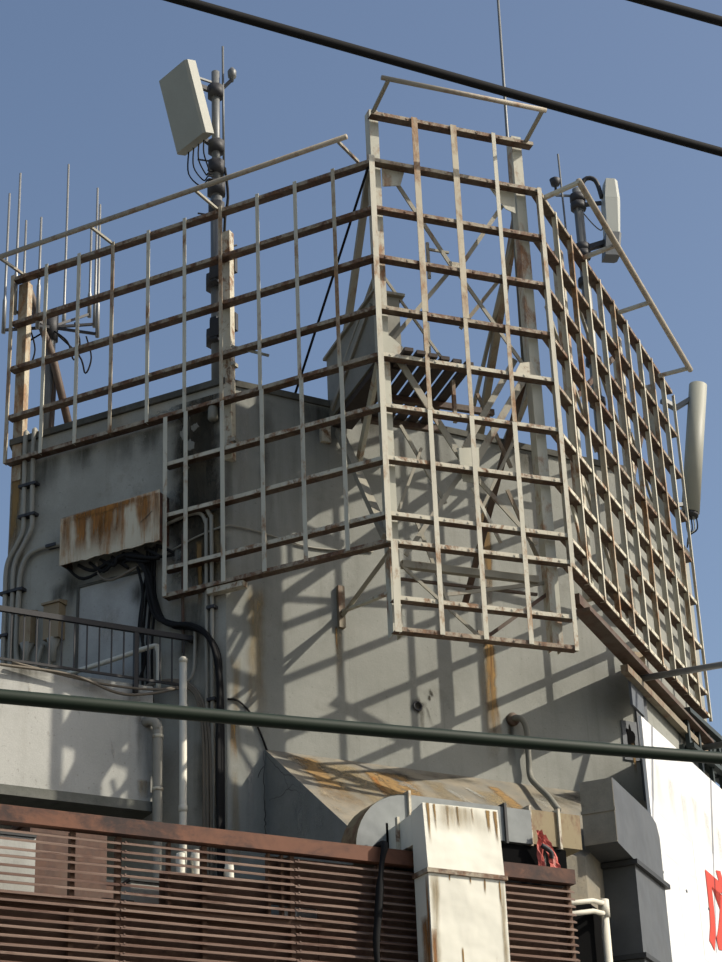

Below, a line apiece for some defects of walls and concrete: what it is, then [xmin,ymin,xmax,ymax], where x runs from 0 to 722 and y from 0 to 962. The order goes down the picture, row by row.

rust [485,644,499,720]
crack [258,751,302,834]
rust [294,756,473,832]
rust [479,787,522,837]
rust [423,882,438,962]